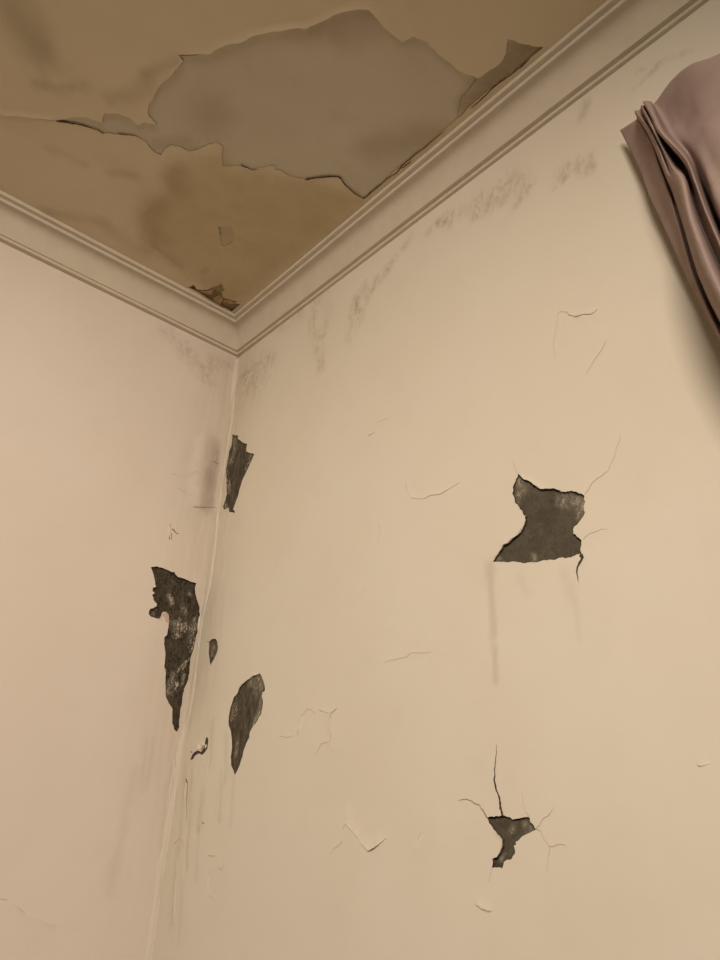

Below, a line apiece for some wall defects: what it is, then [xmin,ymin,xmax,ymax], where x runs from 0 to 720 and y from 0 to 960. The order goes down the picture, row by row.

peeling [56,0,543,199]
peeling [188,284,240,311]
peeling [213,434,255,513]
peeling [488,463,611,582]
peeling [149,566,200,731]
peeling [208,639,218,665]
peeling [228,669,265,774]
peeling [459,745,563,881]